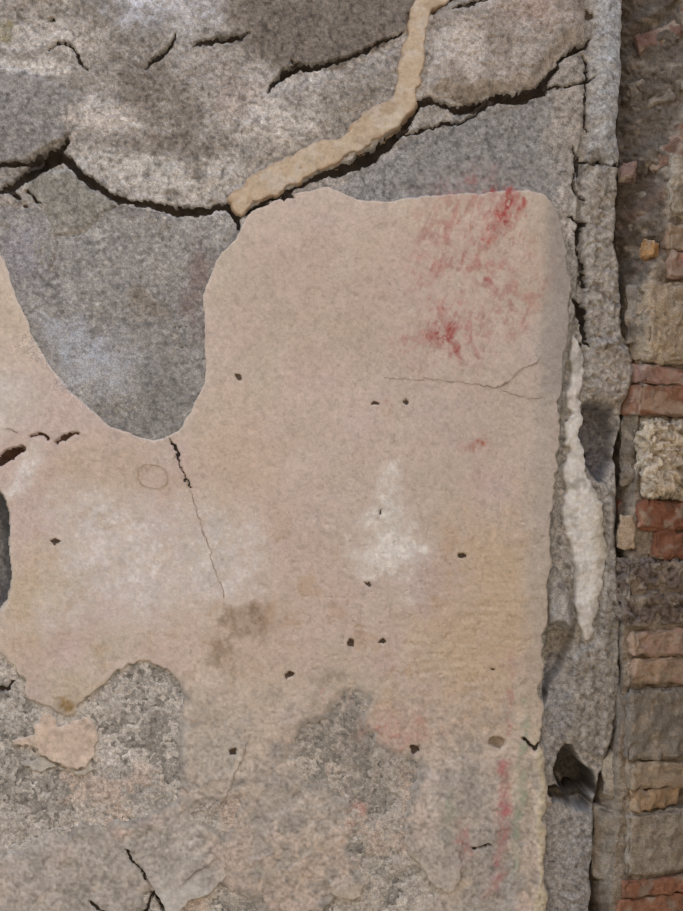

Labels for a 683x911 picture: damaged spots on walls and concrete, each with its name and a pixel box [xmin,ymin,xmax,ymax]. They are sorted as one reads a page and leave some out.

crack [48,18,91,71]
crack [431,0,488,15]
crack [0,32,617,347]
flaking render [0,203,241,440]
crack [384,359,543,399]
flaking render [0,493,12,608]
crack [170,441,224,598]
flaking render [0,652,184,851]
peeling [129,797,259,911]
flaking render [279,687,461,911]